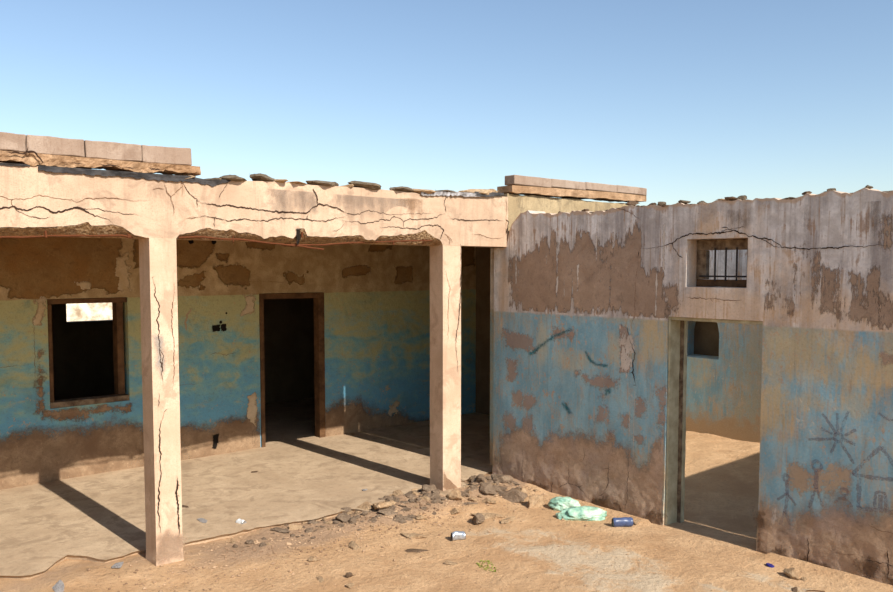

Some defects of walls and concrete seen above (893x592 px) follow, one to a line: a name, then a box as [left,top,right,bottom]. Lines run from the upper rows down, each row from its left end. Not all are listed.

crack [8,148,44,163]
flaking render [0,222,144,326]
crack [0,162,500,369]
spalling [176,228,442,291]
flaking render [508,220,679,318]
crack [627,226,883,381]
flaking render [764,243,893,330]
crack [152,276,194,532]
flaking render [493,326,667,525]
crack [834,523,893,577]